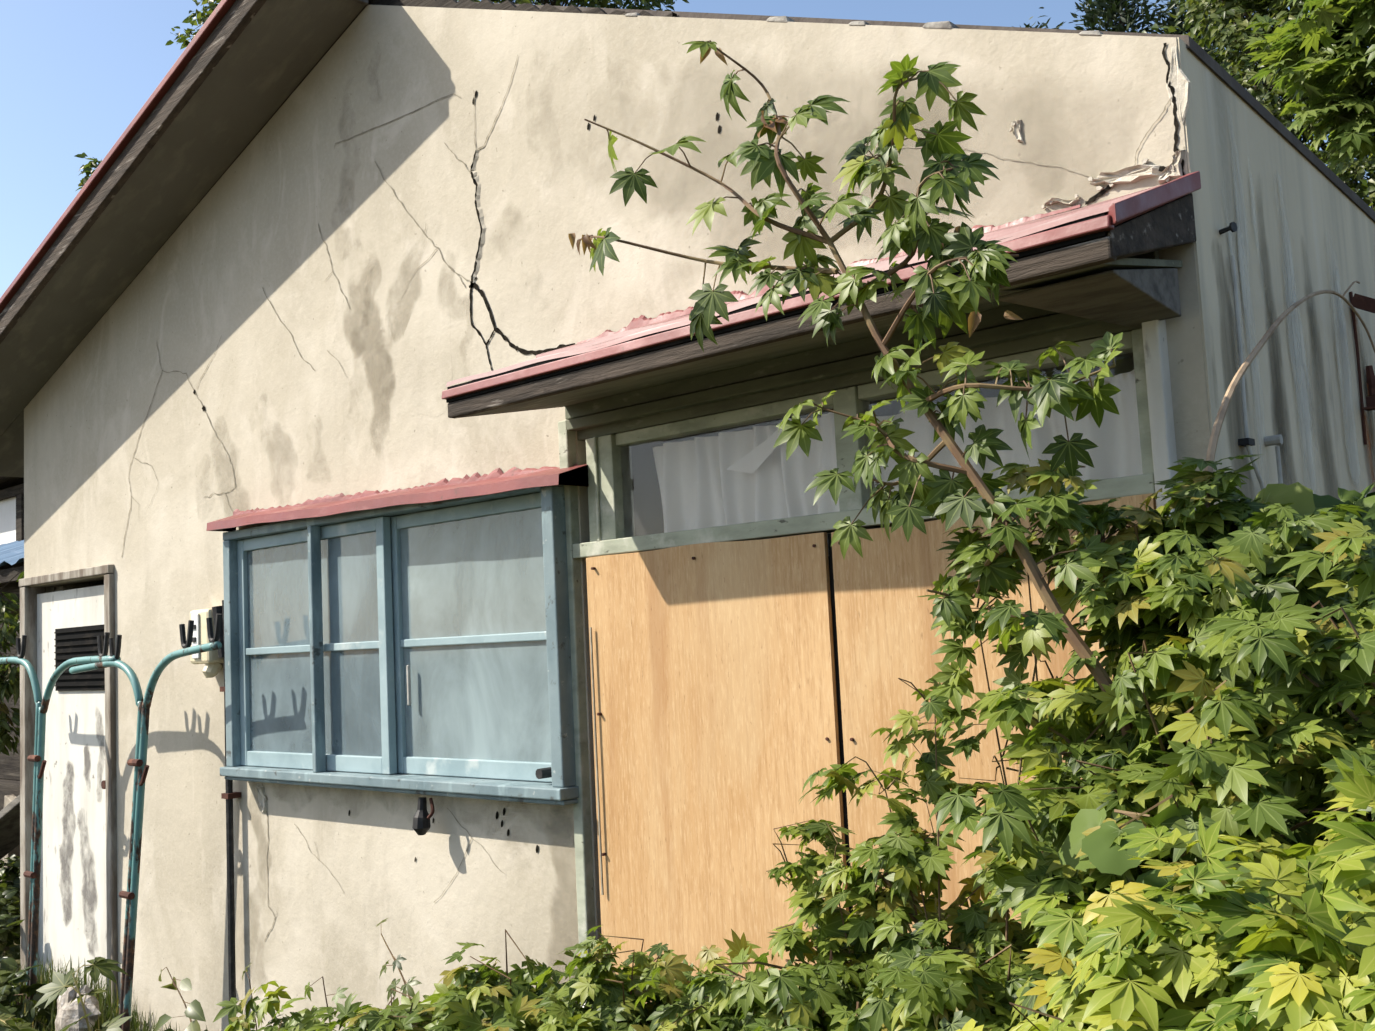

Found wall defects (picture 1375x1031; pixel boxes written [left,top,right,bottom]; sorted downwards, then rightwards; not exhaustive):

crack [121,338,236,557]
crack [318,224,350,309]
crack [334,55,575,370]
crack [963,43,1185,205]
spalling [1041,149,1185,209]
leakage [1230,182,1260,413]
leakage [1277,242,1334,497]
leakage [60,720,107,952]